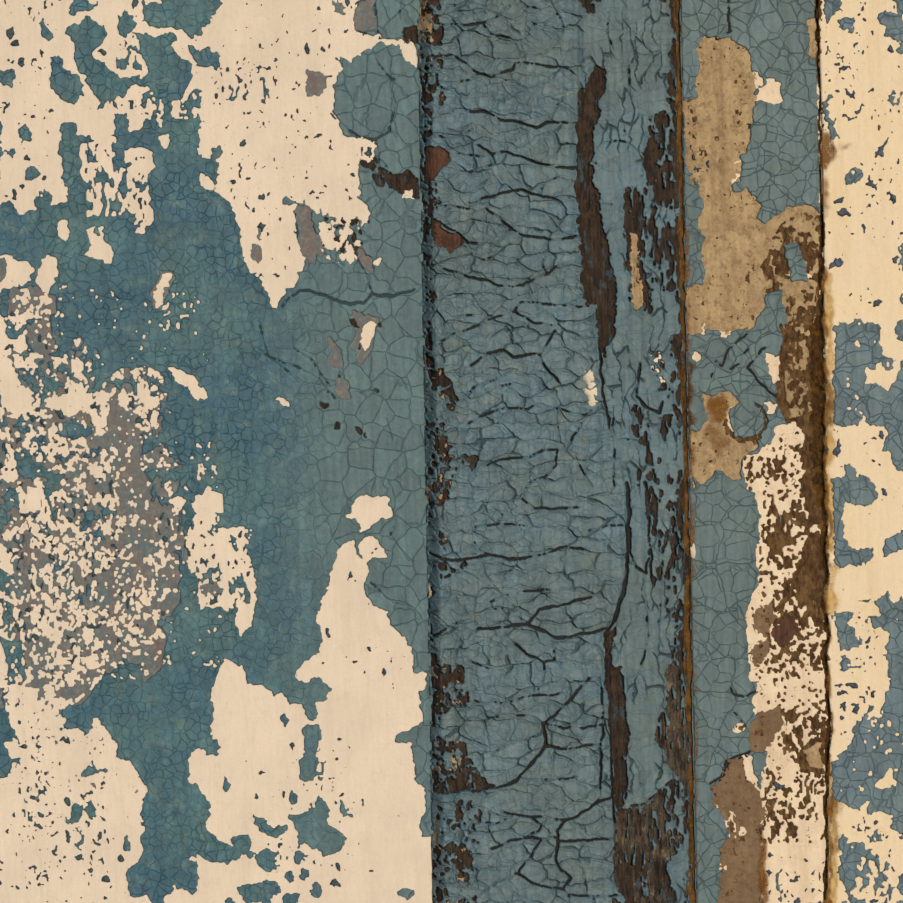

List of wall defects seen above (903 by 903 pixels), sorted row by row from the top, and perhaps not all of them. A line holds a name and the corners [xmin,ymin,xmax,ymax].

peeling [0,255,257,903]
peeling [0,0,425,308]
peeling [164,494,446,903]
peeling [328,310,381,399]
crack [437,5,509,39]
crack [432,54,583,92]
crack [433,104,588,392]
crack [429,346,671,899]
peeling [655,0,903,903]
peeling [617,804,667,903]